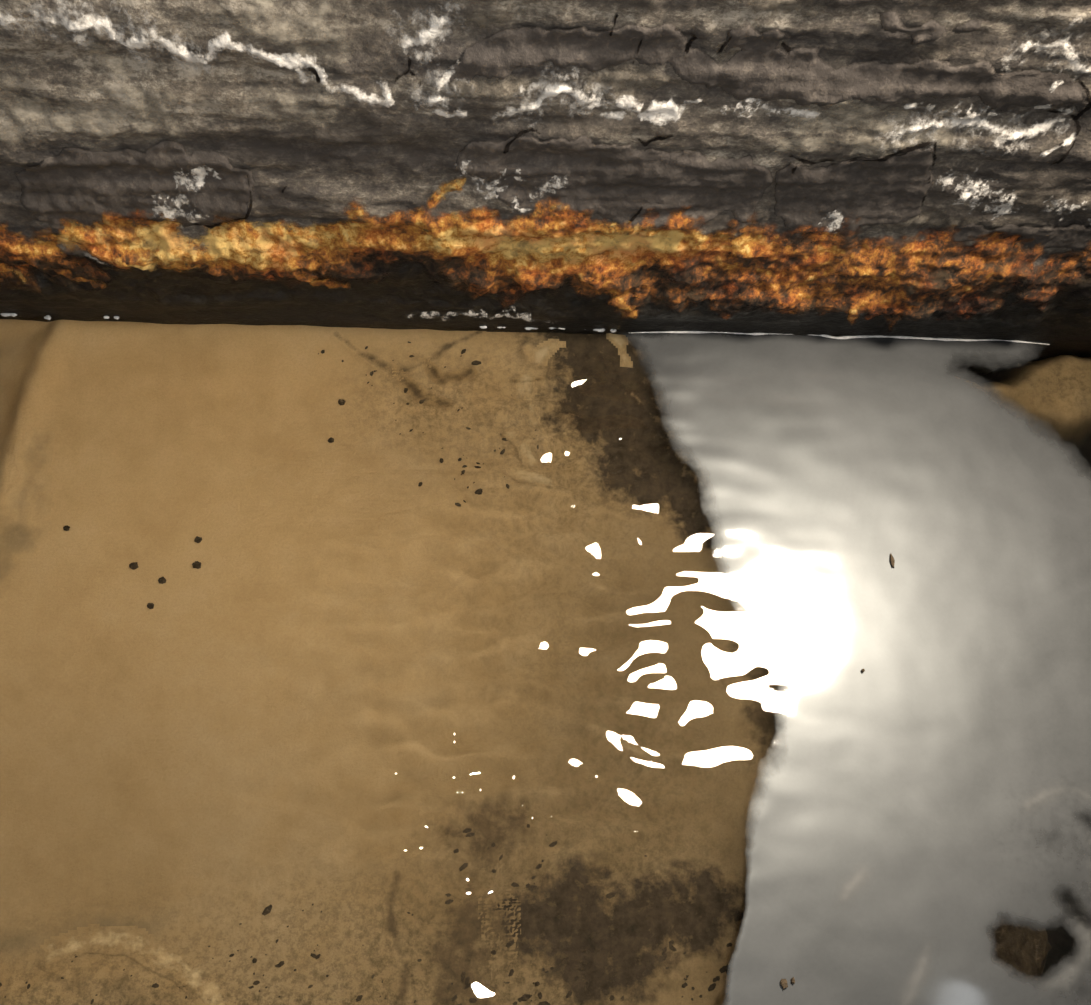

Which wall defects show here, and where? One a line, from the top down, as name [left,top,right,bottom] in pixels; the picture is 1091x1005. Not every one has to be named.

water stain [0,0,395,147]
water stain [402,3,459,59]
water stain [411,71,467,118]
water stain [503,80,702,125]
water stain [1005,34,1091,76]
crack [1048,77,1091,165]
crack [790,142,937,206]
corrosion [0,178,1091,331]